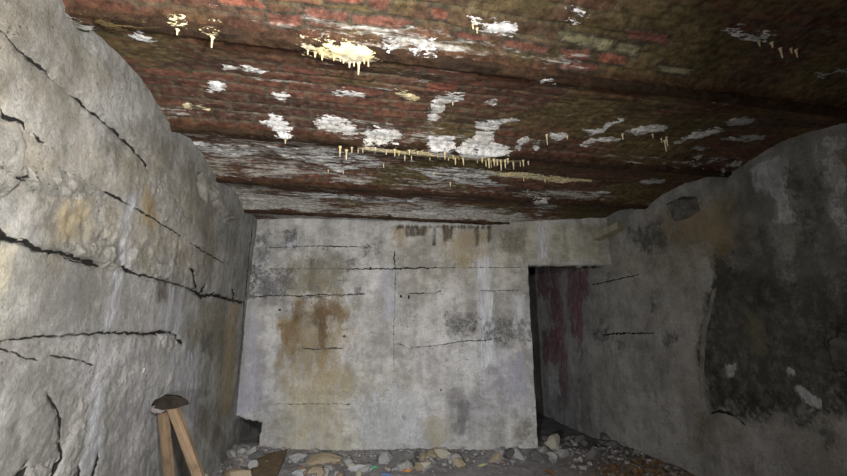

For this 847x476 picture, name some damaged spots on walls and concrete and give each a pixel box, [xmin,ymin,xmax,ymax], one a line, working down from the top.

damp [467,15,518,37]
damp [297,29,437,75]
crack [1,109,44,143]
crack [69,94,148,172]
damp [207,80,227,93]
damp [193,114,592,187]
damp [424,92,465,121]
damp [580,117,766,175]
crack [0,227,100,268]
crack [103,191,367,387]
crack [0,329,183,366]
crack [47,394,99,476]